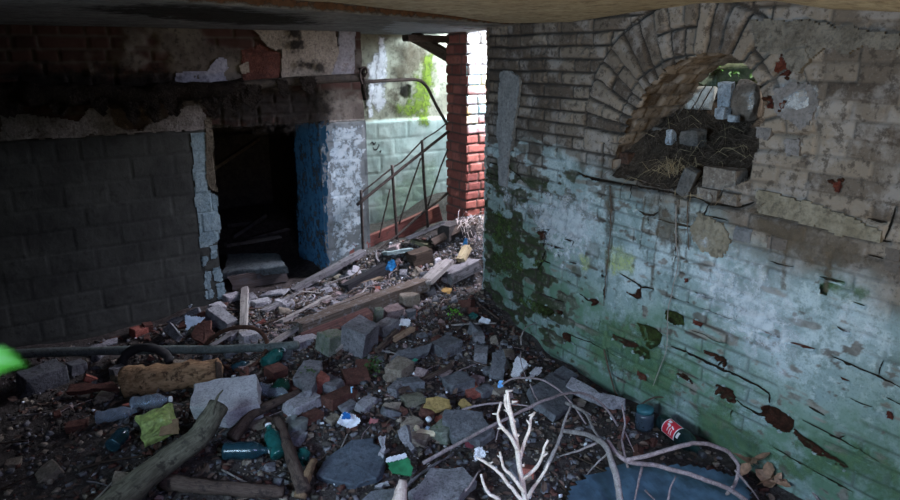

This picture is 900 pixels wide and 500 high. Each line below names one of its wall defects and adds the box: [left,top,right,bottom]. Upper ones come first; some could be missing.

spalling [239,44,281,80]
damp [419,54,433,126]
spalling [714,106,731,120]
spalling [761,95,787,112]
peeling [294,120,366,269]
spalling [827,178,845,193]
damp [536,196,588,257]
damp [641,199,694,249]
spalling [611,323,664,360]
crack [671,331,771,417]
spalling [710,381,737,404]
spalling [759,405,856,472]